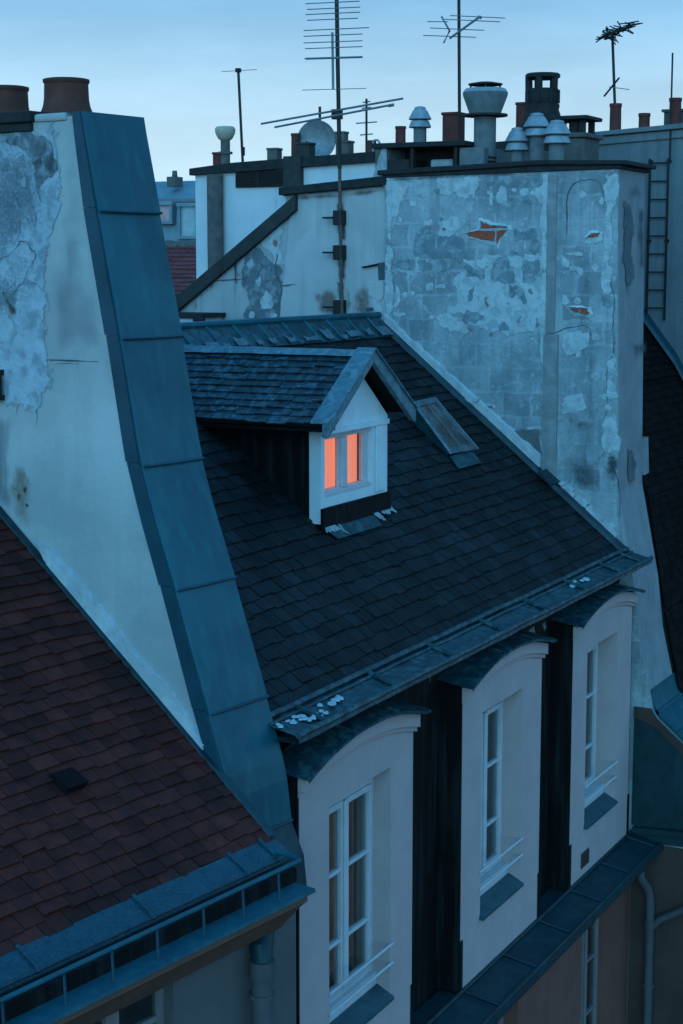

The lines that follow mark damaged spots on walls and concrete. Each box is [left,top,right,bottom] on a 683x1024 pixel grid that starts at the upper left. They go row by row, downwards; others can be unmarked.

crack [1,164,54,296]
flaking render [0,121,61,412]
peeling [183,172,548,450]
crack [566,179,605,235]
peeling [561,172,635,358]
peeling [560,392,590,414]
peeling [591,353,621,411]
peeling [628,449,636,483]